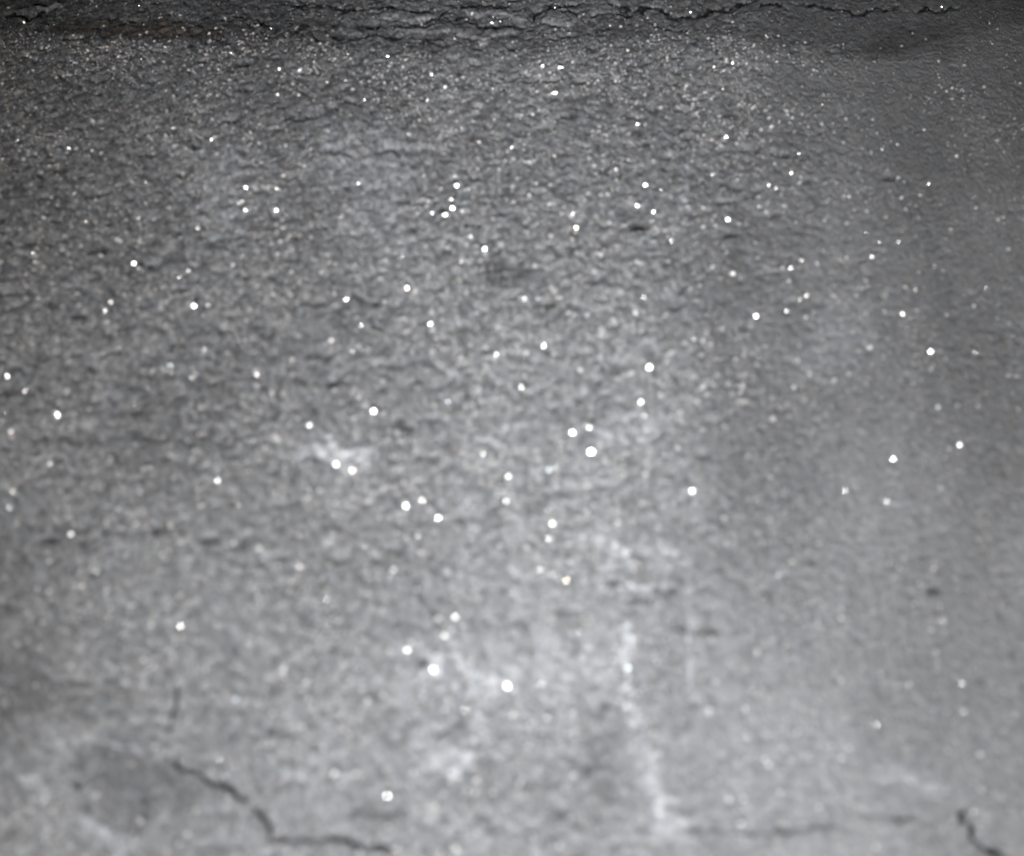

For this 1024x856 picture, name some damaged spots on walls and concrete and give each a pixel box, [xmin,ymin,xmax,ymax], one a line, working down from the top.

crack [240,3,394,34]
crack [348,5,496,46]
crack [616,3,954,19]
crack [170,691,179,725]
crack [165,756,399,856]
crack [954,811,1004,856]